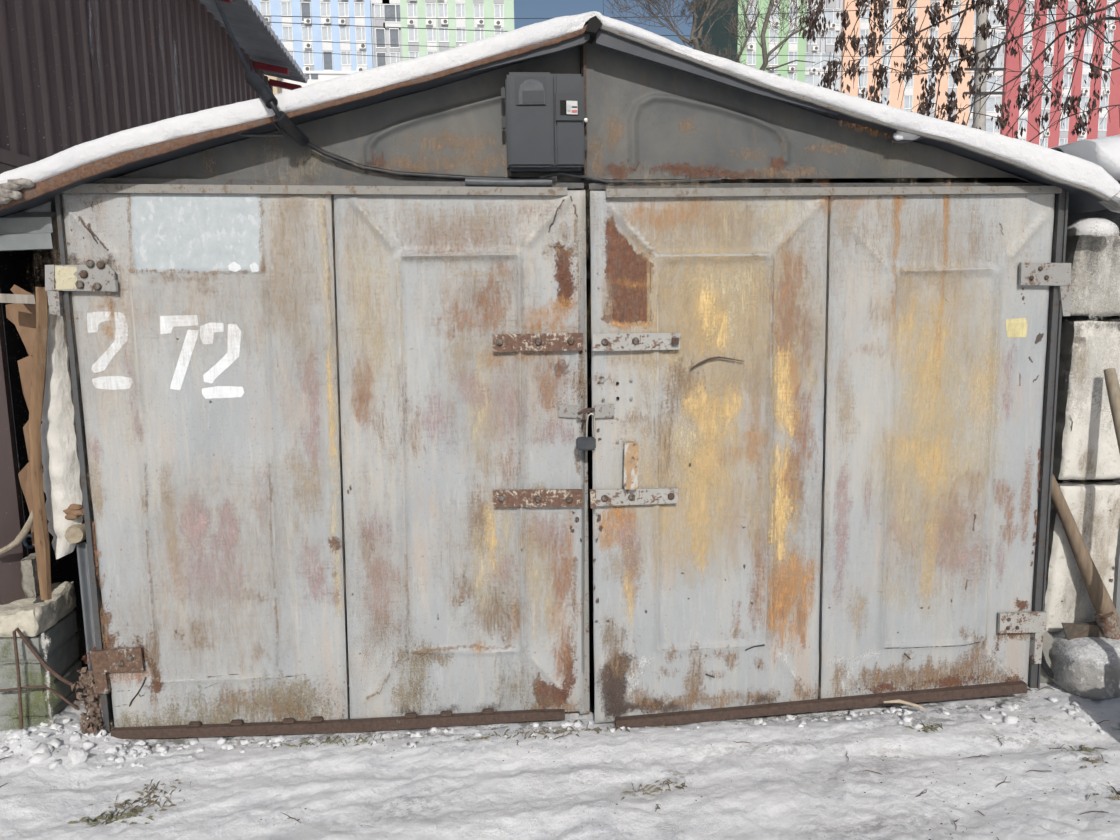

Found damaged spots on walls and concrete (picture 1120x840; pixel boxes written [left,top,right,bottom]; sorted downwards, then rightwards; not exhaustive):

rust [604,157,814,180]
rust [525,220,581,331]
rust [597,217,654,328]
rust [763,551,814,648]
rust [83,608,344,727]
rust [392,641,448,713]
rust [498,627,577,711]
rust [595,620,780,717]
rust [795,629,1026,699]